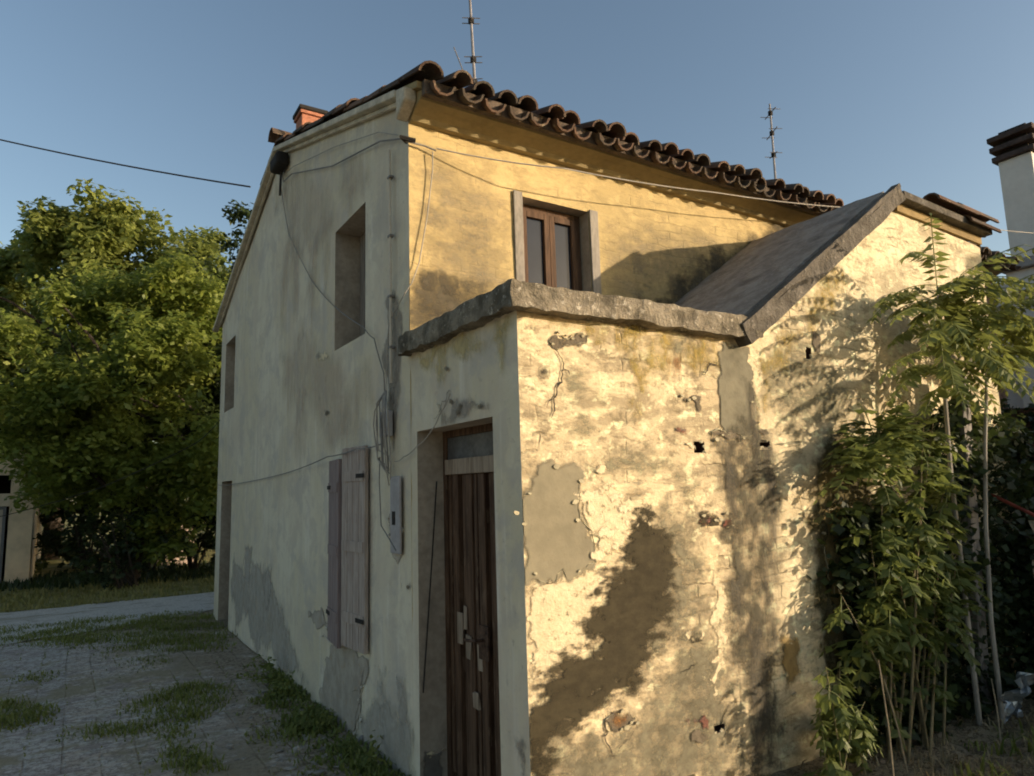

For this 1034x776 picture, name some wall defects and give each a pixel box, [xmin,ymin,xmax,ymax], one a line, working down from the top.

damp [410,272,481,327]
flaking render [549,330,587,350]
spalling [805,331,821,361]
crack [547,350,570,418]
spalling [676,354,770,453]
flaking render [513,459,652,586]
flaking render [699,511,734,529]
damp [522,342,873,776]
flaking render [604,709,640,733]